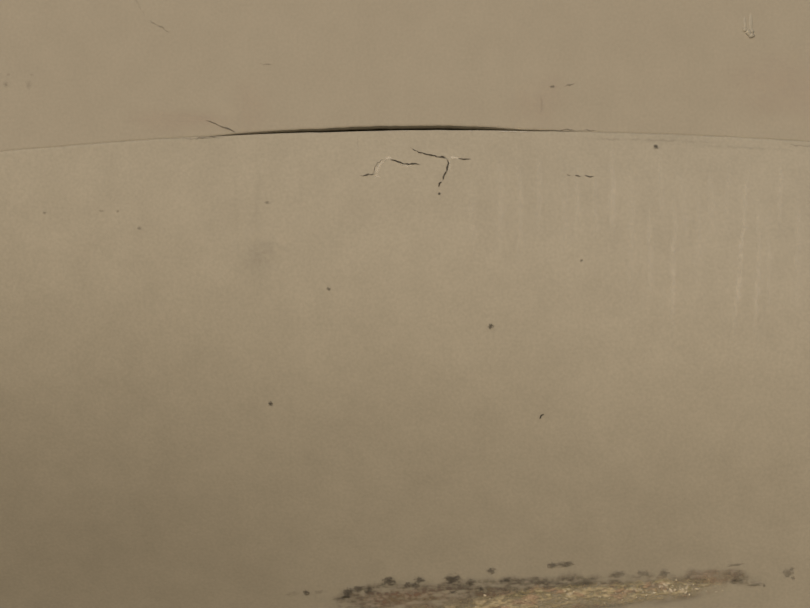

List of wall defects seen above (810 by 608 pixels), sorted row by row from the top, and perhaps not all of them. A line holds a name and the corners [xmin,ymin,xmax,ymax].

crack [298,128,476,195]
spalling [345,576,723,608]